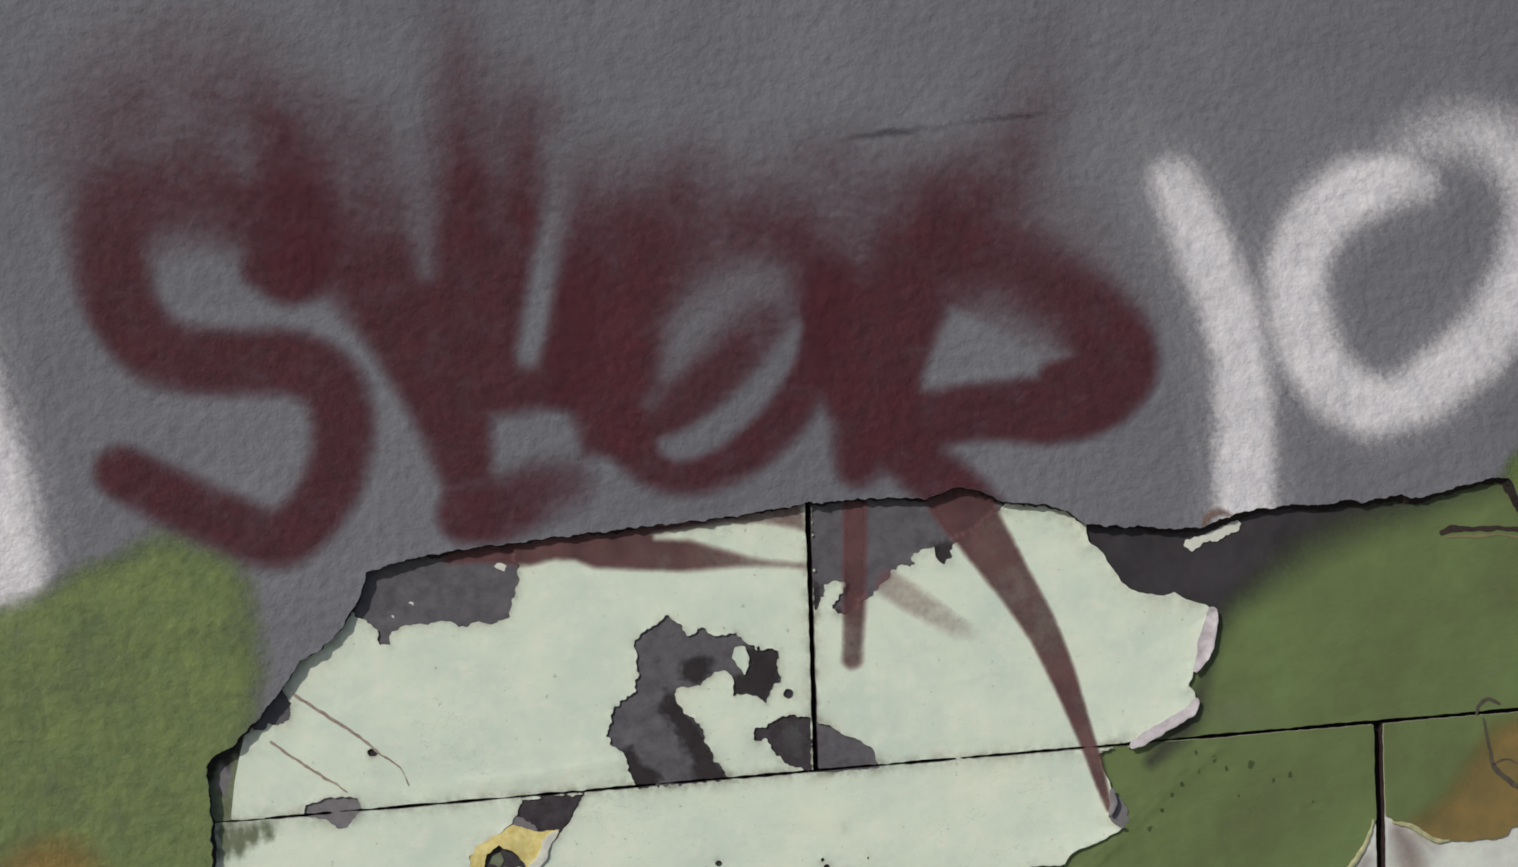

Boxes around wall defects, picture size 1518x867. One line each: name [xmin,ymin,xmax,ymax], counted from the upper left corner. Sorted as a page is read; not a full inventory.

spalling [206,477,1518,867]